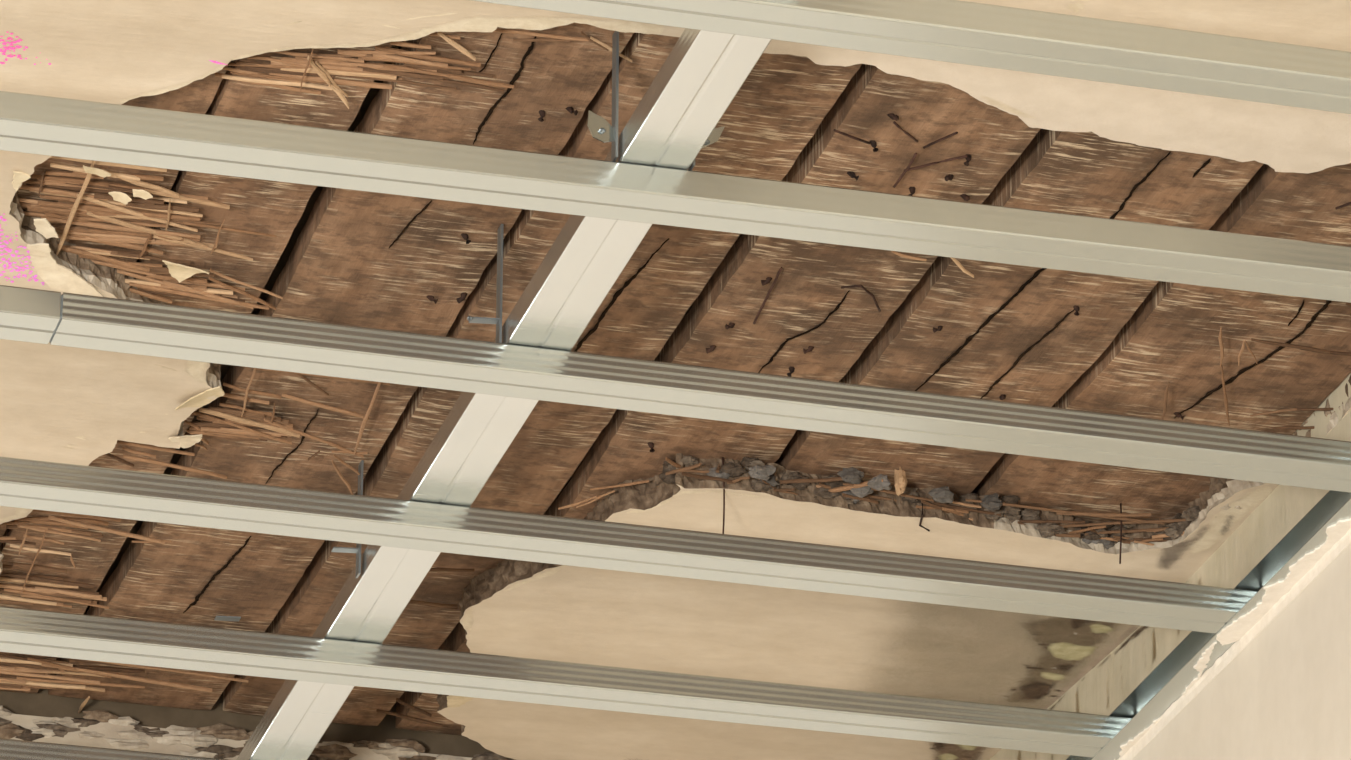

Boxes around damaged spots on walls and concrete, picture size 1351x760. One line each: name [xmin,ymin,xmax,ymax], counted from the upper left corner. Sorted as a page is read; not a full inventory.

flaking render [119,15,666,104]
crack [473,34,537,145]
flaking render [9,165,167,304]
flaking render [162,260,209,283]
flaking render [168,360,225,448]
crack [574,238,669,352]
crack [915,268,1047,391]
crack [1110,151,1211,219]
crack [1174,300,1331,419]
flaking render [585,453,1274,554]
flaking render [459,559,562,650]
leakage [827,599,1157,713]